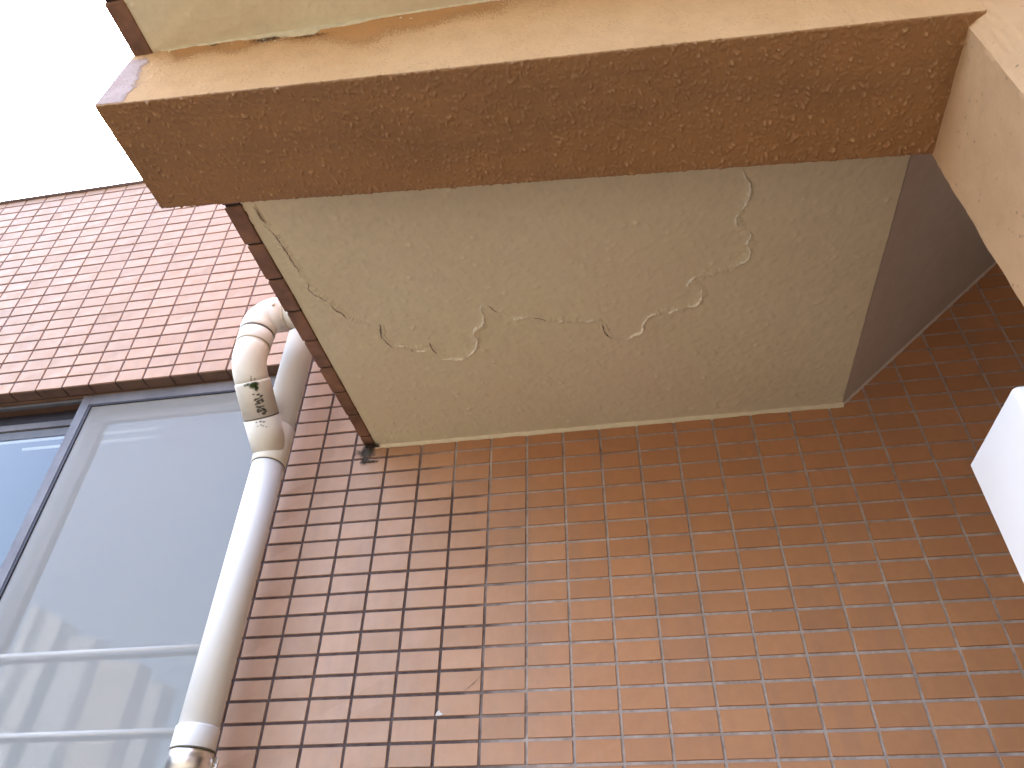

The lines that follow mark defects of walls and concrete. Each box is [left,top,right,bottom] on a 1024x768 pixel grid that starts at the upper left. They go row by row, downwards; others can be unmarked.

crack [252,170,759,361]